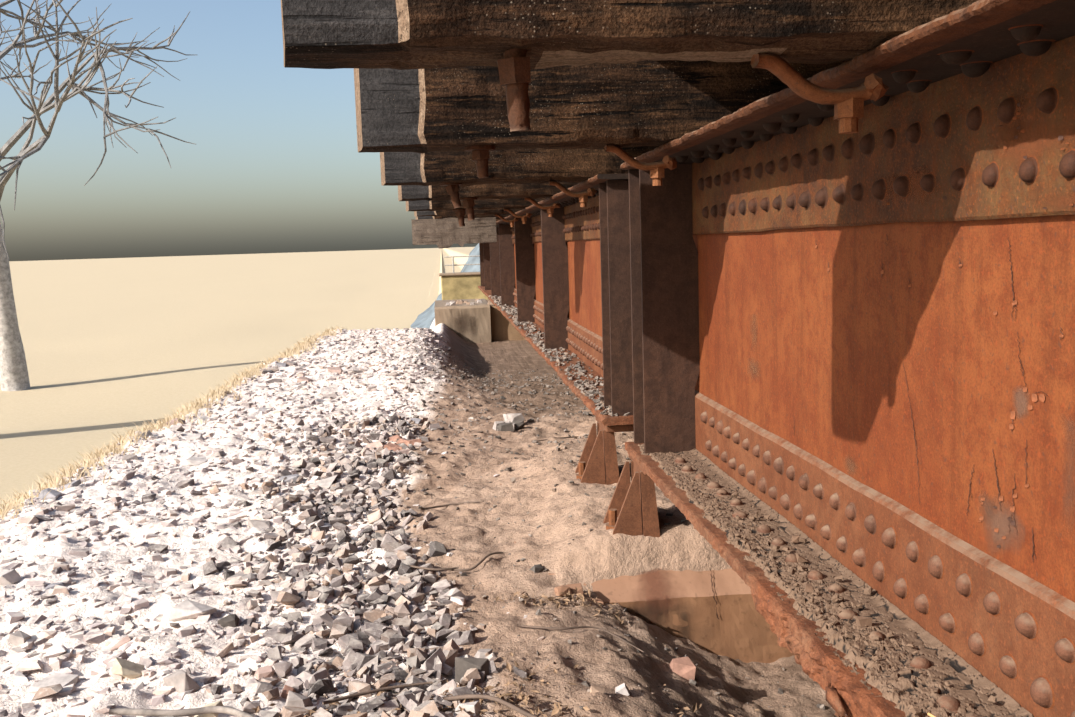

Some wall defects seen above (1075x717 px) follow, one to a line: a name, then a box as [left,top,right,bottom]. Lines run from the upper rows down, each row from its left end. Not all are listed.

rust [825,680,848,717]